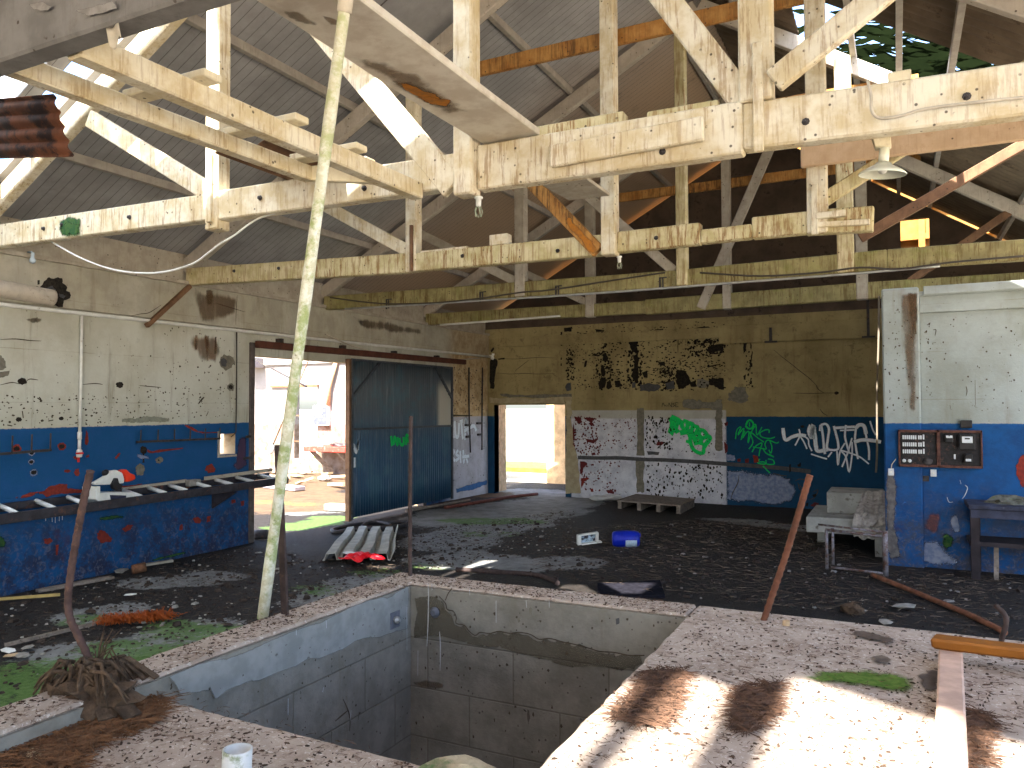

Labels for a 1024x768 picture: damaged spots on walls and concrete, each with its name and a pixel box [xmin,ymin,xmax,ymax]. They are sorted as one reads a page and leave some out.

spalling [36,277,71,307]
peeling [561,322,753,392]
corrosion [902,294,917,410]
peeling [573,415,819,621]
water stain [414,588,644,671]